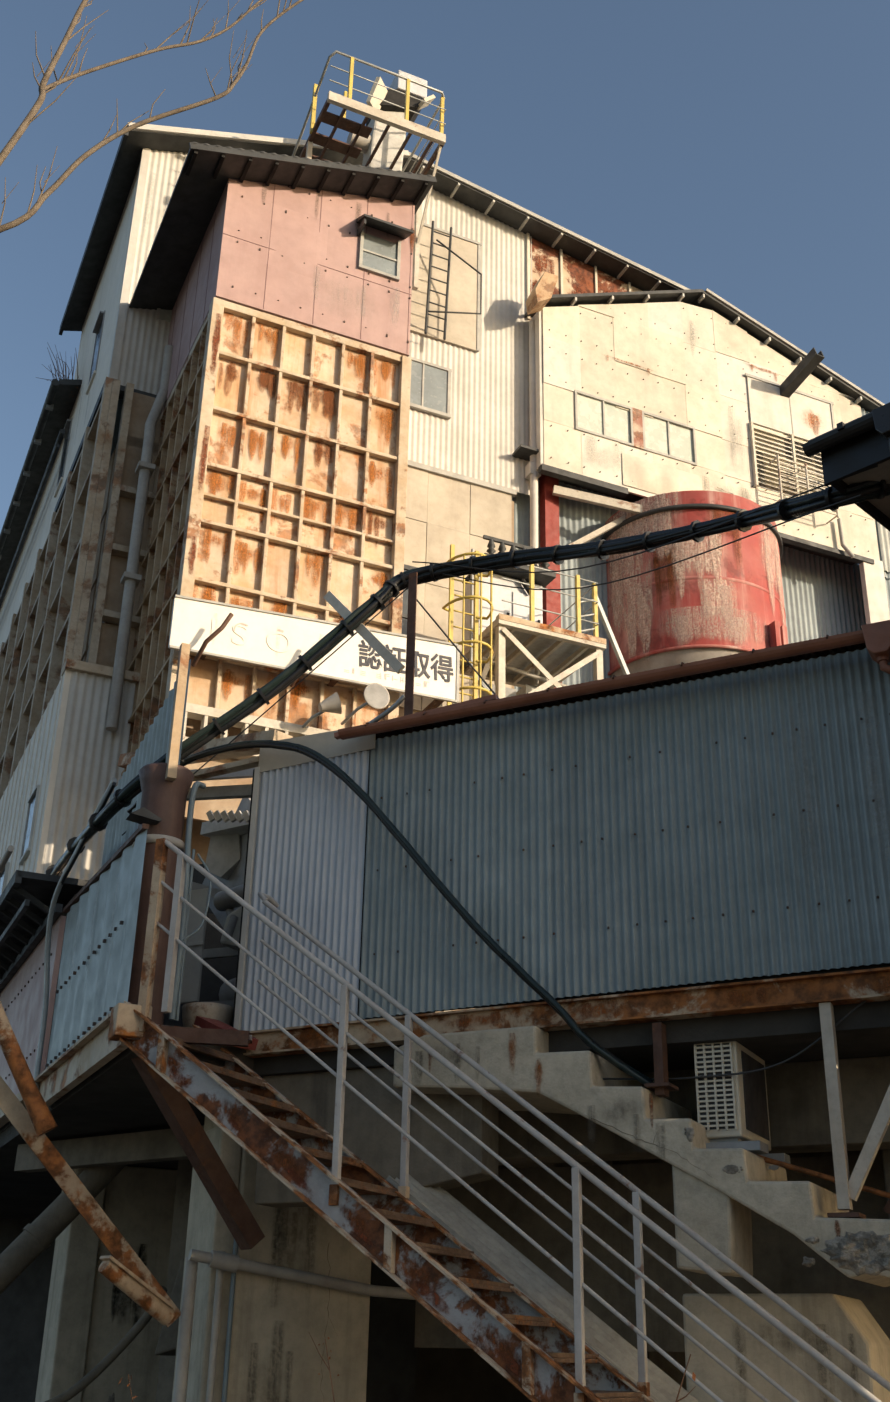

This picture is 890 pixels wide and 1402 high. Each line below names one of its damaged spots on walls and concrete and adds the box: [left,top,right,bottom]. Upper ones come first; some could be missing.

rust [532,256,553,288]
rust [210,313,279,393]
rust [348,352,396,385]
rust [258,370,335,420]
rust [376,408,396,440]
rust [198,422,385,544]
rust [370,462,392,496]
rust [189,527,262,572]
rust [713,509,742,558]
rust [193,585,253,608]
rust [653,544,679,604]
spalling [802,1231,890,1276]